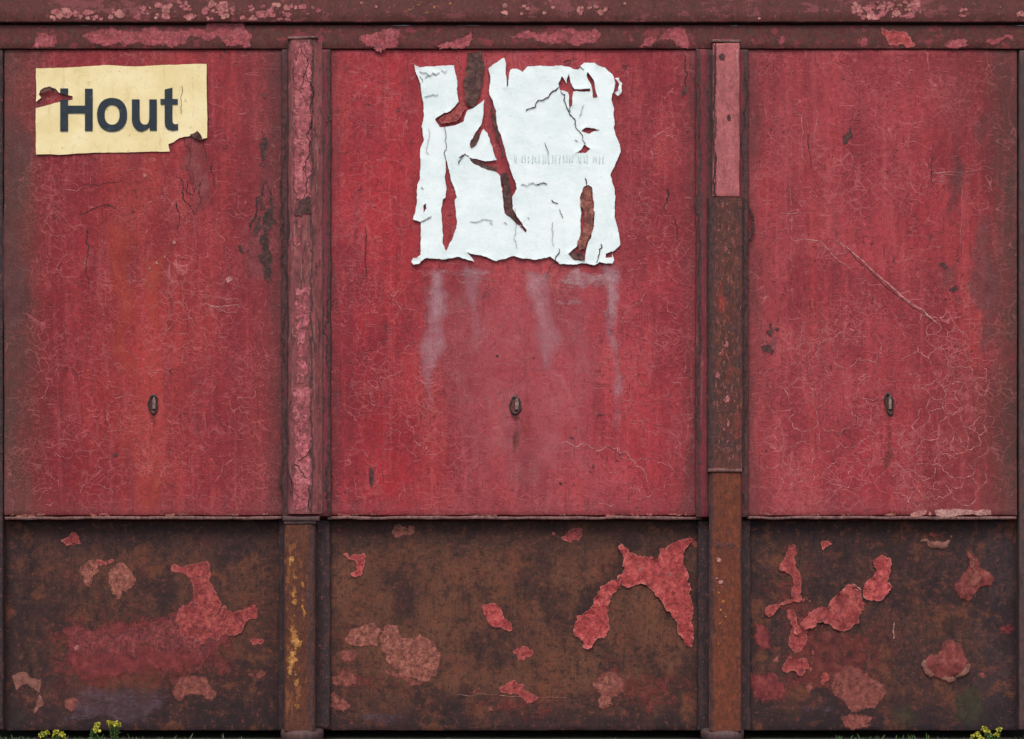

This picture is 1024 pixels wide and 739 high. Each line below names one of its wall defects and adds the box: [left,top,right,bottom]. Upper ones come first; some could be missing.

peeling [33,0,322,49]
peeling [848,0,923,48]
crack [42,172,114,329]
crack [120,50,314,370]
crack [740,71,990,509]
crack [55,367,159,494]
crack [279,404,374,513]
peeling [62,559,264,701]
corrosion [330,692,395,723]
peeling [331,622,441,687]
peeling [573,538,697,650]
peeling [750,544,893,730]